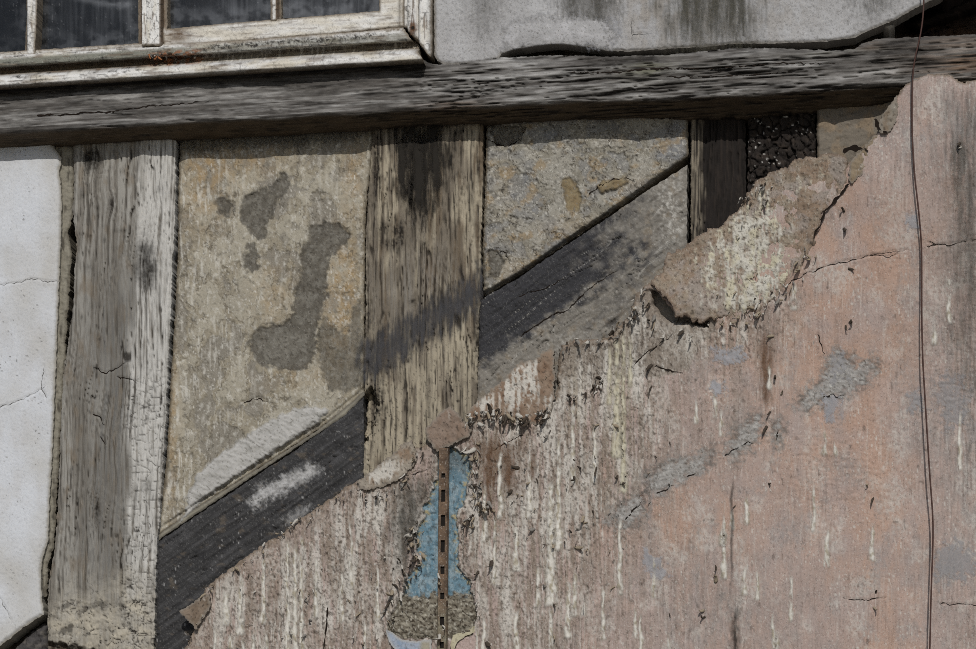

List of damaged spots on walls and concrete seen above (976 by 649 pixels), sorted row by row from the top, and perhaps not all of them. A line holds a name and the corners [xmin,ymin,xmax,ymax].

peeling [737,182,773,207]
crack [813,184,849,241]
peeling [707,247,817,326]
crack [788,251,899,285]
peeling [462,403,551,438]
peeling [352,442,547,649]